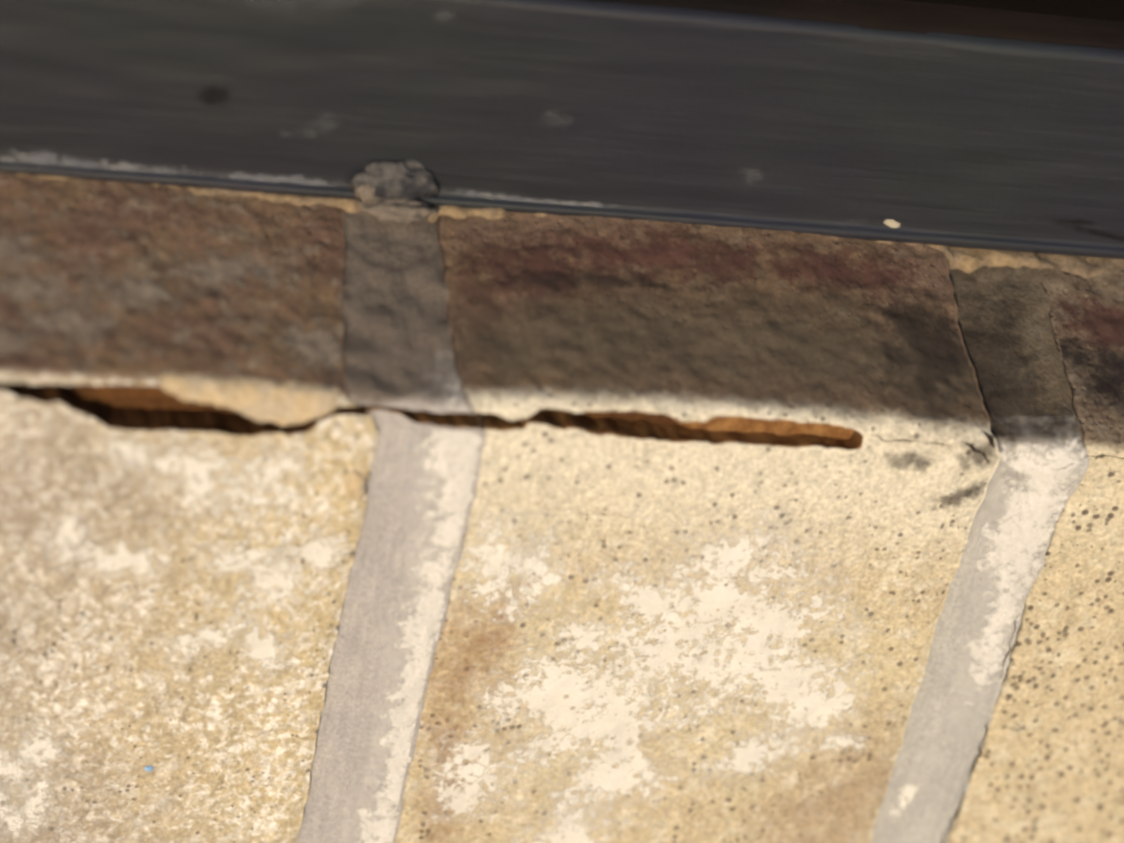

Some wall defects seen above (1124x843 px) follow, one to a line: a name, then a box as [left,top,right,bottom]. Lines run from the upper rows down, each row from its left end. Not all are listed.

crack [63,384,237,413]
crack [672,416,995,503]